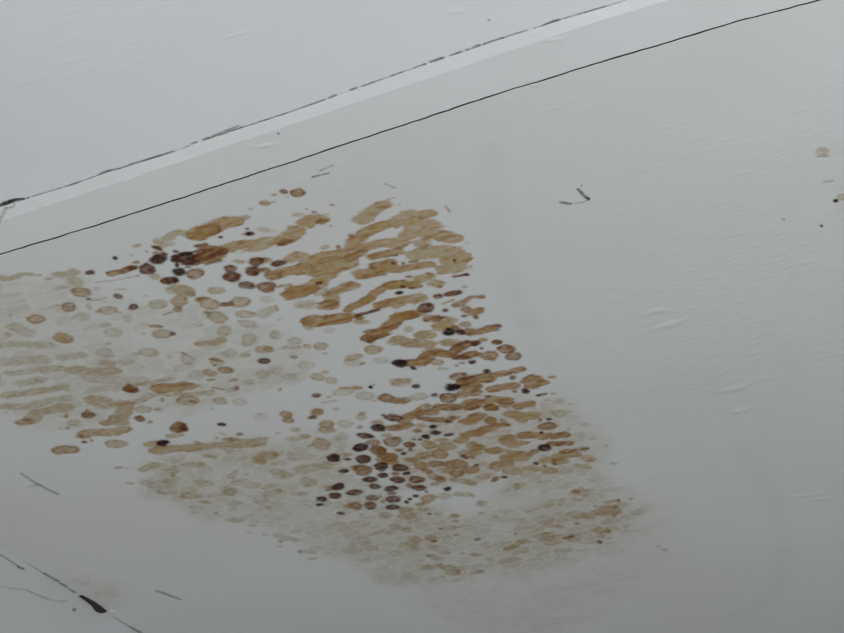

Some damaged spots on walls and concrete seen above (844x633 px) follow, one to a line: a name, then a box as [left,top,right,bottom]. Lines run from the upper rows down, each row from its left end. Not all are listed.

damp [260,189,305,205]
damp [54,333,73,343]
damp [106,201,589,515]
damp [16,405,69,425]
damp [52,382,199,454]